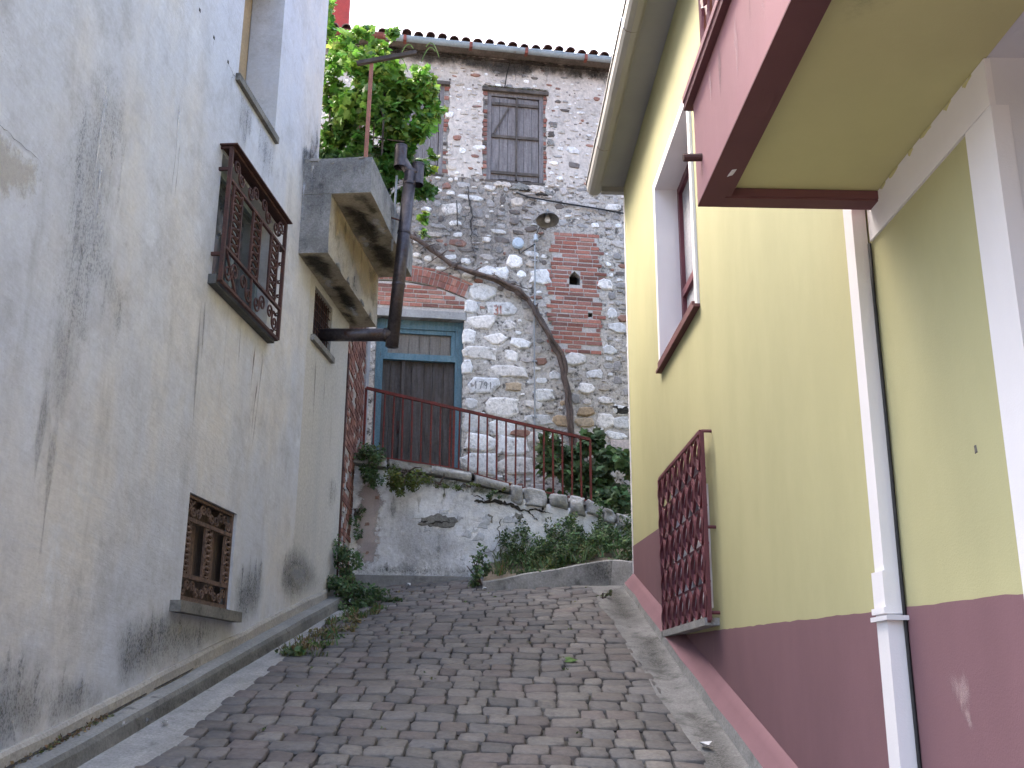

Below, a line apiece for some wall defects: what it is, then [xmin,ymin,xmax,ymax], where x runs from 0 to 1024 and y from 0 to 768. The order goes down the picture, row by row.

damp [304,256,357,324]
peeling [412,510,533,569]
crack [471,494,552,559]